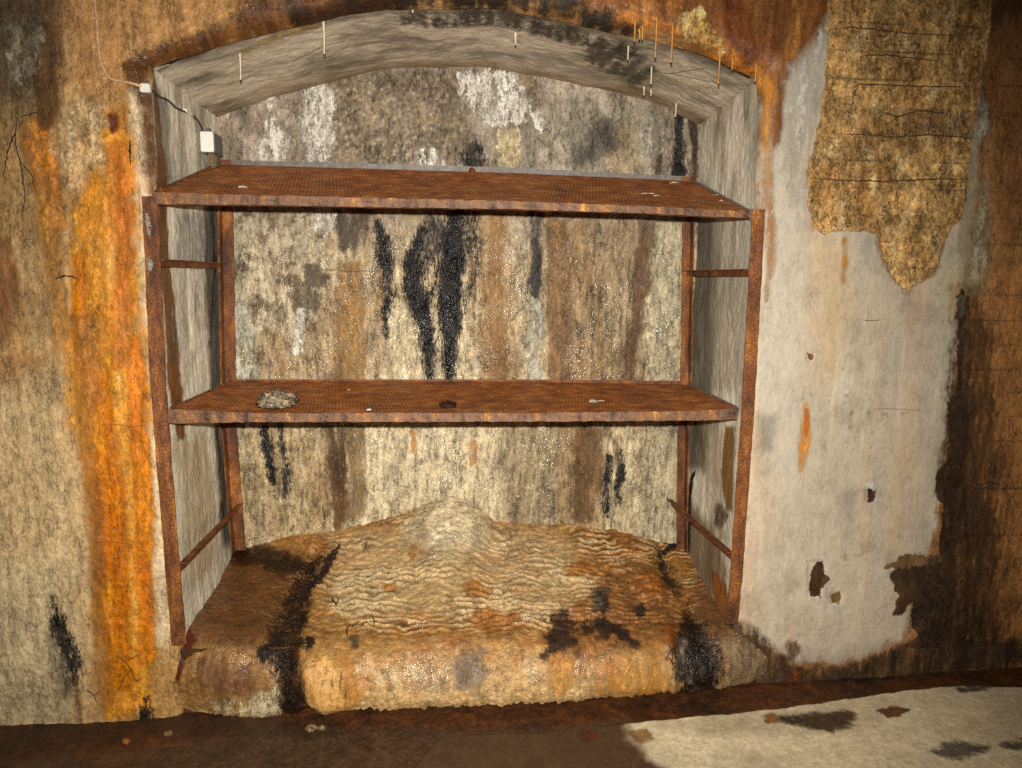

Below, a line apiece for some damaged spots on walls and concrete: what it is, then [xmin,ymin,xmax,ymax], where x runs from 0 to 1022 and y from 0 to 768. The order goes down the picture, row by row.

crack [3,112,38,226]
leakage [456,67,545,168]
leakage [638,112,699,181]
corrosion [584,0,829,276]
peeling [806,0,996,290]
leakage [313,207,481,379]
corrosion [22,0,403,720]
leakage [258,422,291,500]
corrosion [799,405,811,469]
leakage [729,100,1022,685]
spalling [809,561,841,604]
leakage [49,594,83,714]